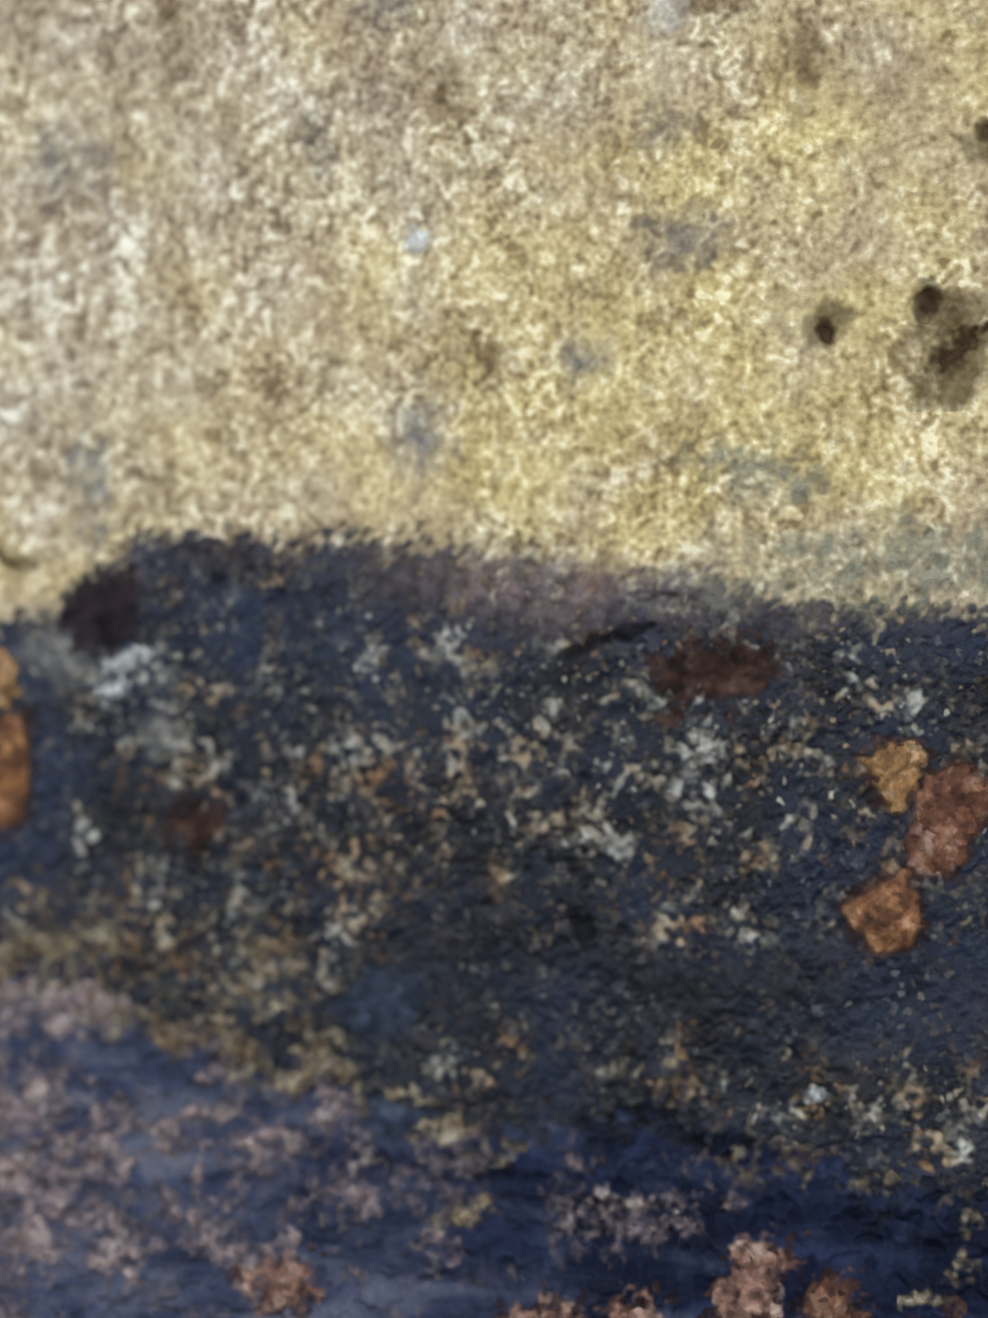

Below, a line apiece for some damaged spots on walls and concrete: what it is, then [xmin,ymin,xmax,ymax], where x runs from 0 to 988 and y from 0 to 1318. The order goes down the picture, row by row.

leakage [56,562,160,669]
leakage [833,518,988,595]
corrosion [0,647,34,828]
corrosion [842,737,988,955]
leakage [0,956,371,1318]
leakage [311,1121,478,1209]